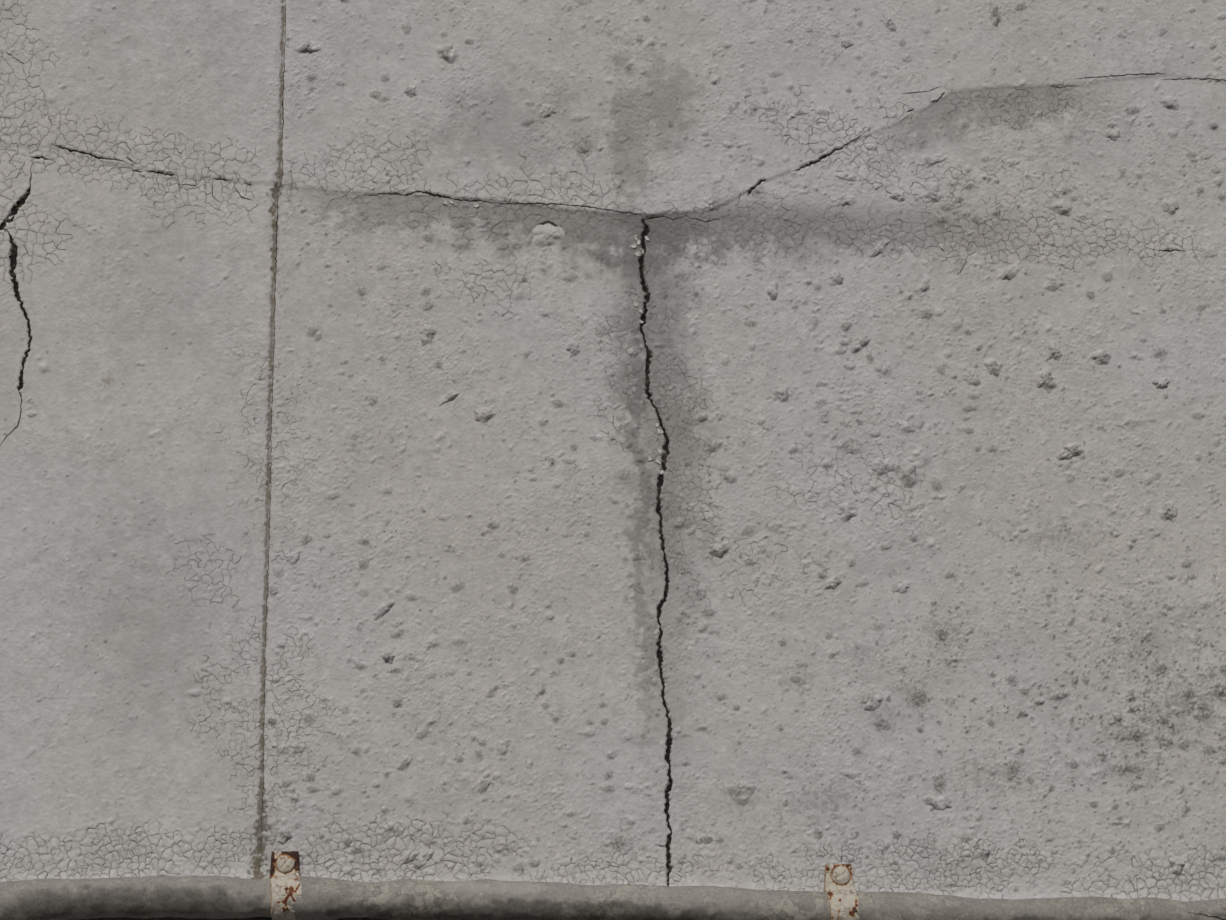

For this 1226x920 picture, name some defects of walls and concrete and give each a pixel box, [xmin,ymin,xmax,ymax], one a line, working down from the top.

crack [0,0,260,444]
crack [166,526,255,608]
crack [215,352,311,563]
crack [278,72,1226,886]
crack [0,605,338,882]